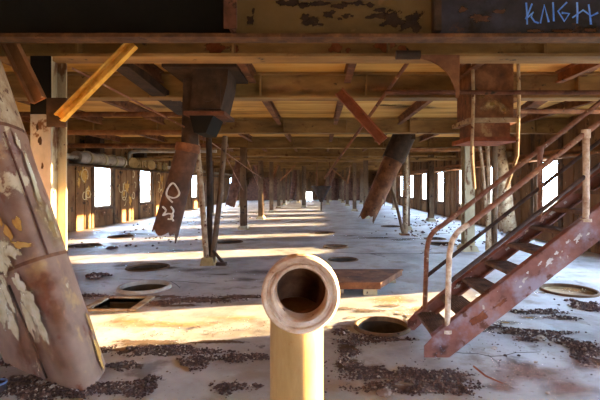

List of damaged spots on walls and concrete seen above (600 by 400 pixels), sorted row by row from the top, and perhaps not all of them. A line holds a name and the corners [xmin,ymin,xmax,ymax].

peeling [276,0,423,33]
peeling [15,133,59,239]
peeling [0,216,50,345]